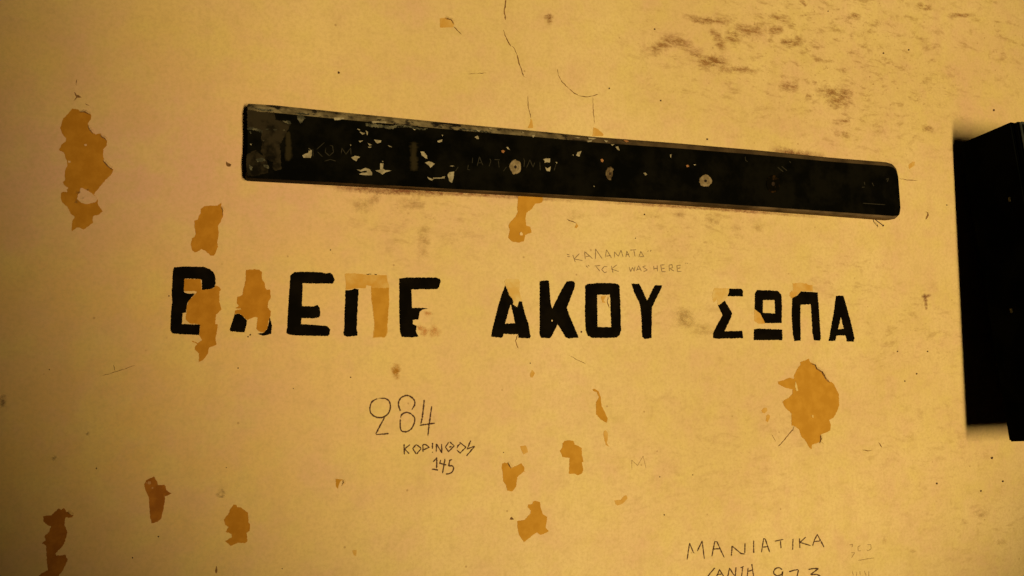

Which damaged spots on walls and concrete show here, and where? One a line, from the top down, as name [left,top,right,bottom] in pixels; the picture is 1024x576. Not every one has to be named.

crack [503,0,524,76]
peeling [59,80,114,231]
peeling [191,203,226,256]
peeling [508,196,543,243]
peeling [184,279,221,362]
peeling [235,269,271,332]
peeling [778,359,839,449]
peeling [560,440,583,475]
peeling [39,508,75,576]
peeling [144,477,171,523]
peeling [224,505,250,546]
peeling [510,501,548,542]